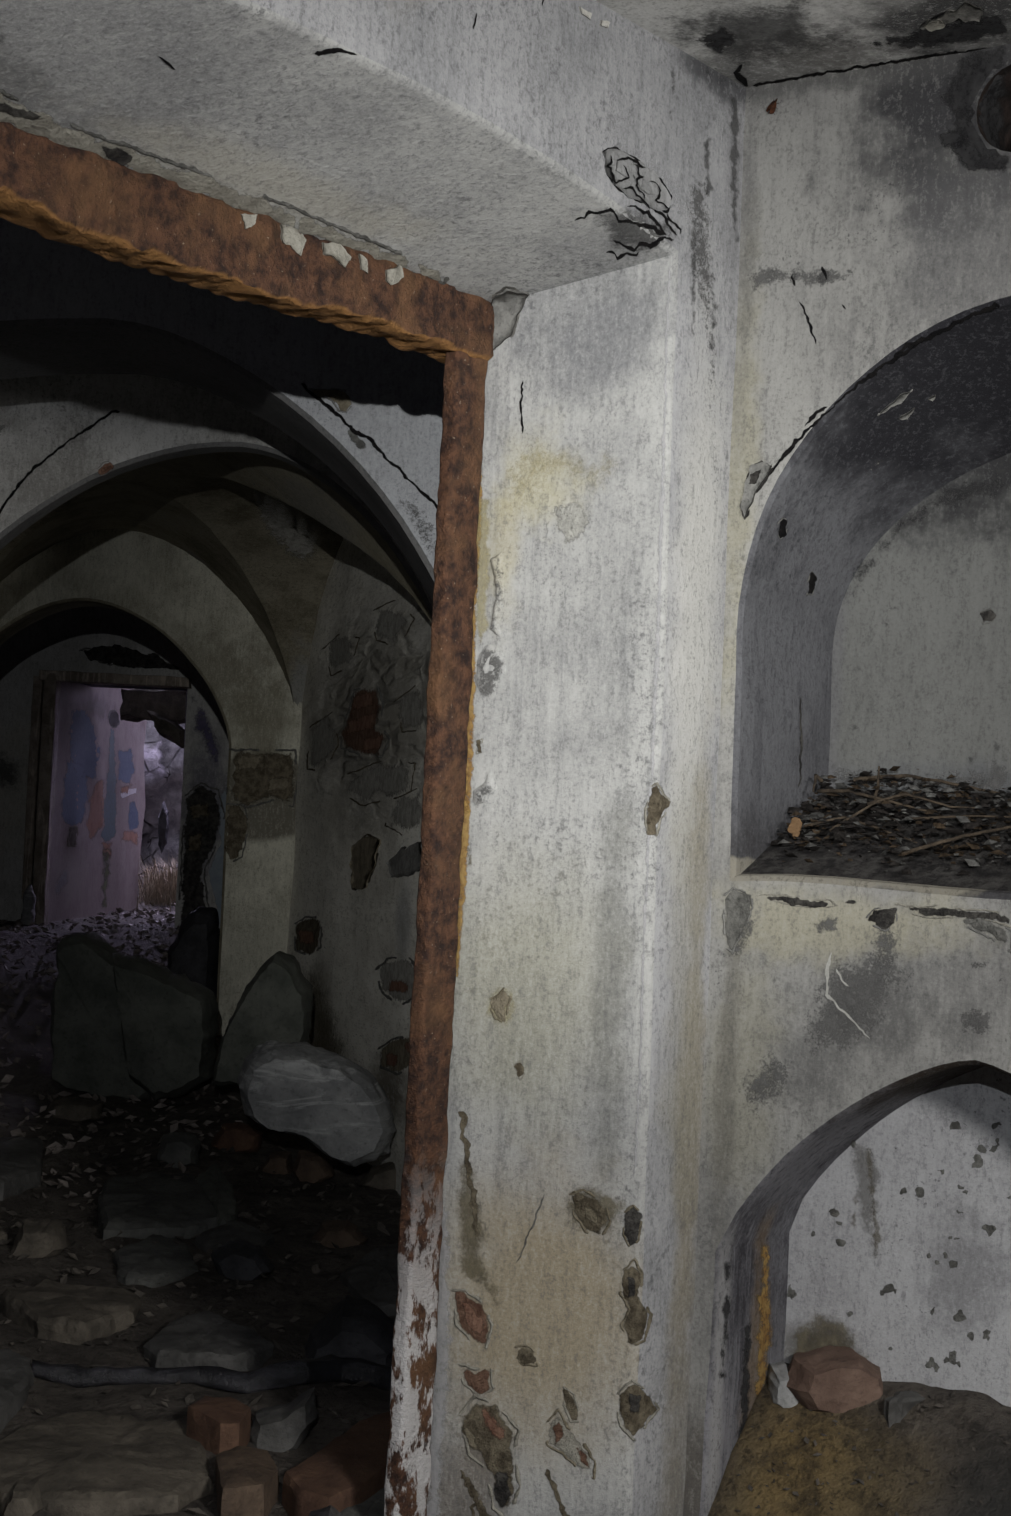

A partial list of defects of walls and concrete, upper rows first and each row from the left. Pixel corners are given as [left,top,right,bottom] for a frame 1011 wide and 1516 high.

leakage [683,0,820,64]
leakage [874,15,1007,49]
crack [576,205,682,260]
crack [0,410,120,514]
crack [301,383,437,509]
rust [456,475,483,977]
spalling [178,748,297,924]
spalling [644,782,670,836]
spalling [568,1189,653,1346]
spalling [458,1363,521,1516]
spalling [617,1380,660,1441]
crack [545,1469,570,1516]